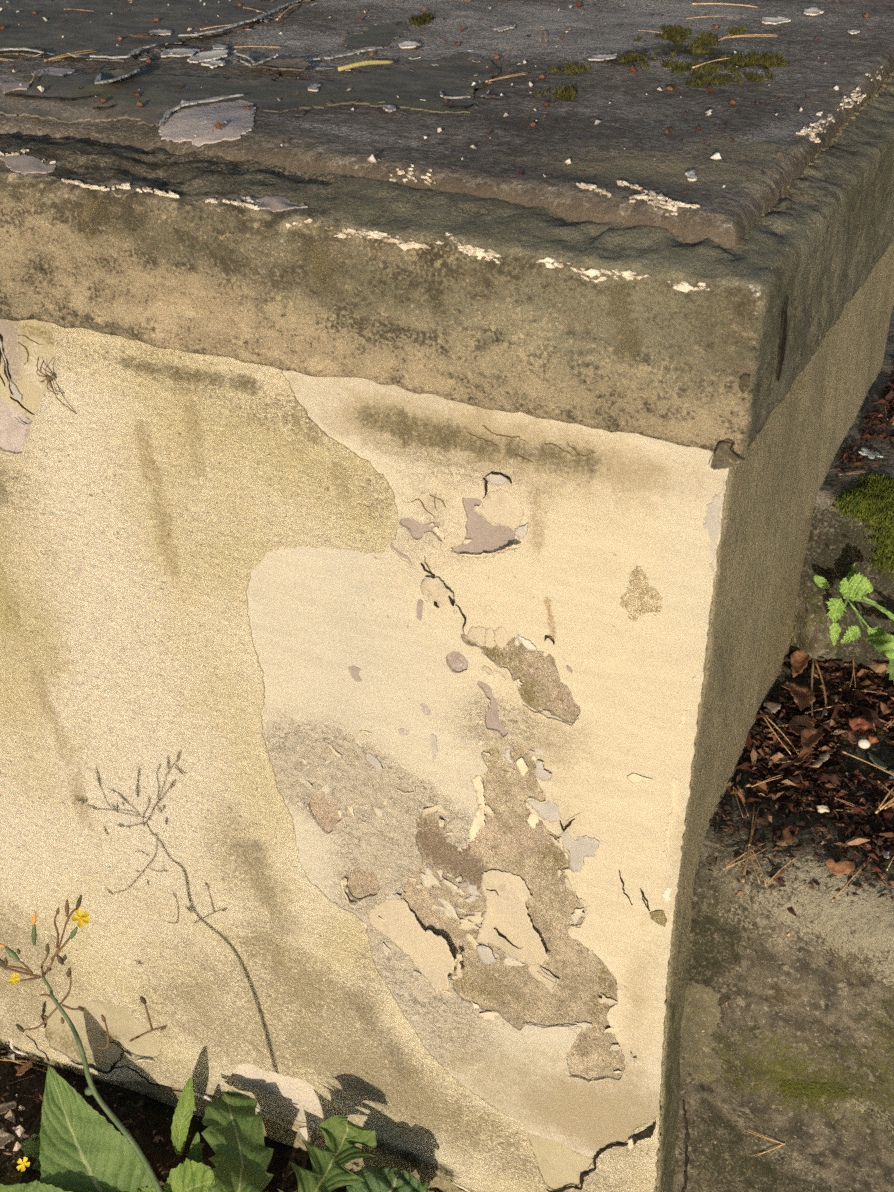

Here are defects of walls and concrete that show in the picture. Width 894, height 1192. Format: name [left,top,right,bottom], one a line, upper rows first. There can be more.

peeling [0,0,501,147]
peeling [576,180,700,215]
peeling [334,228,501,263]
peeling [536,257,651,282]
peeling [667,281,711,293]
crack [0,334,44,415]
peeling [0,319,57,456]
peeling [246,370,745,1189]
peeling [41,997,213,1102]
peeling [229,1064,327,1140]
crack [547,1121,656,1192]
crack [682,1101,690,1192]